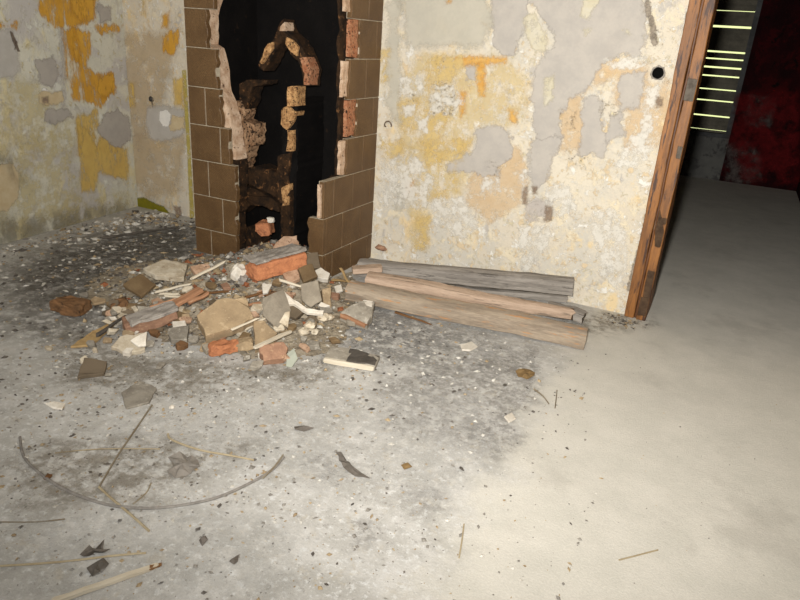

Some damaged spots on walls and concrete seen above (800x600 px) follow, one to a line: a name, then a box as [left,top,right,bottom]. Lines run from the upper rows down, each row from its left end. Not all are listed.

peeling [35,0,131,148]
flaking render [146,105,185,141]
peeling [380,0,665,272]
flaking render [590,208,637,291]